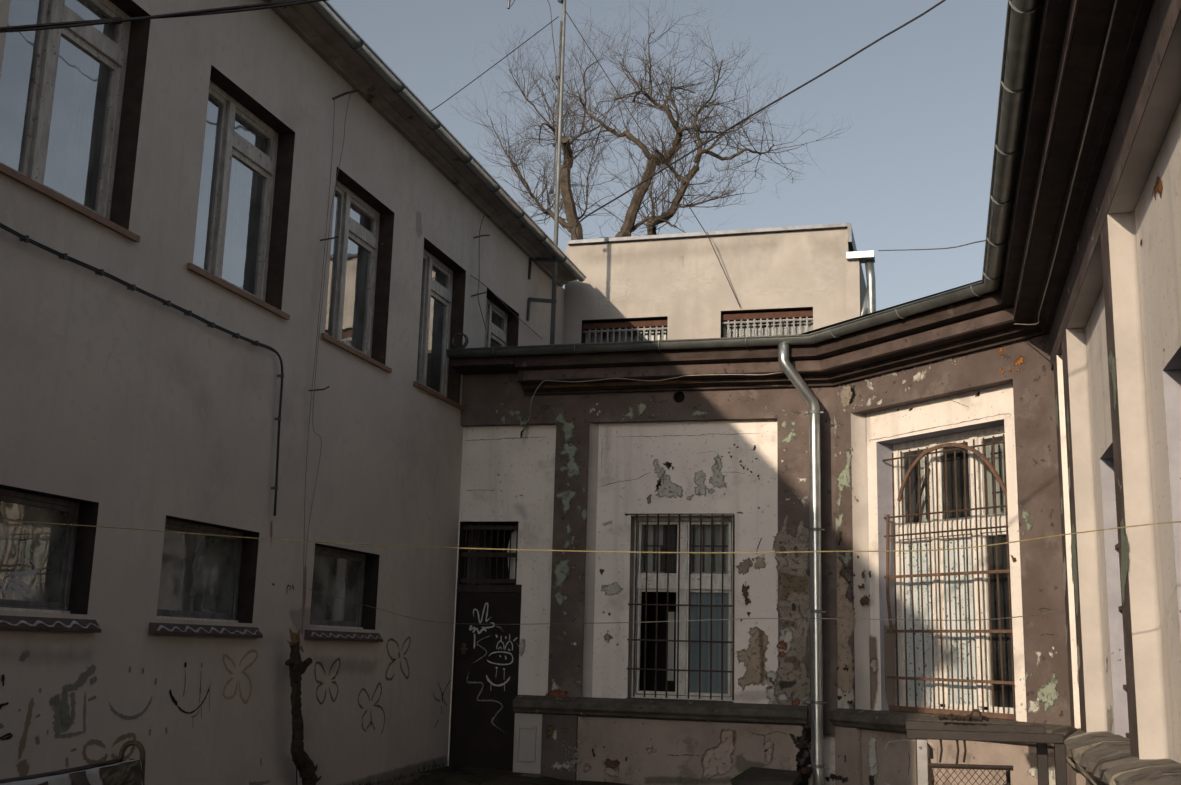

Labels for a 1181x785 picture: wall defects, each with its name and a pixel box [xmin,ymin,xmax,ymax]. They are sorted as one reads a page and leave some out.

peeling [1152,176,1163,201]
spalling [834,355,963,437]
peeling [549,400,589,615]
peeling [647,444,760,504]
peeling [600,569,624,595]
spalling [735,477,811,706]
spalling [835,447,871,709]